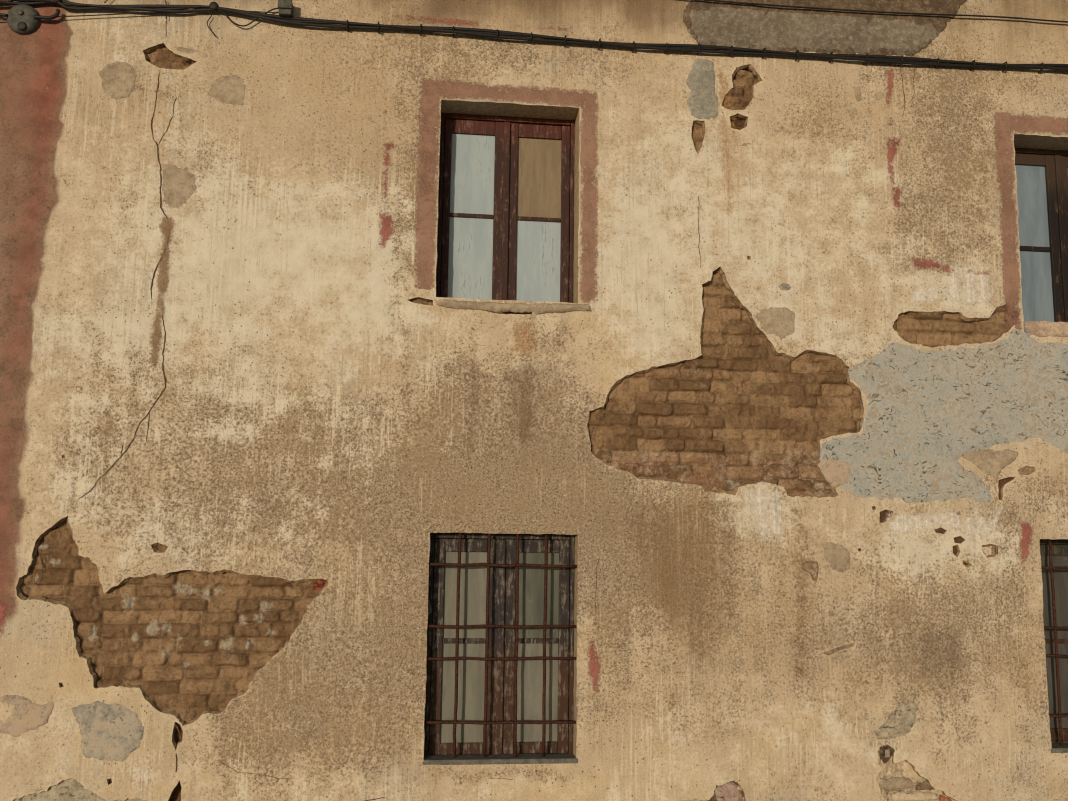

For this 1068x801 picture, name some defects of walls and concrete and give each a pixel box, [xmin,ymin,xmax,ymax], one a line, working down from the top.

flaking render [143,43,197,70]
flaking render [721,64,763,130]
flaking render [691,120,705,154]
crack [74,73,177,507]
flaking render [893,304,1019,348]
flaking render [587,267,864,498]
flaking render [998,466,1036,500]
flaking render [16,516,328,750]
flaking render [0,695,54,737]
flaking render [168,780,182,801]
flaking render [697,780,746,801]
flaking render [876,745,957,801]